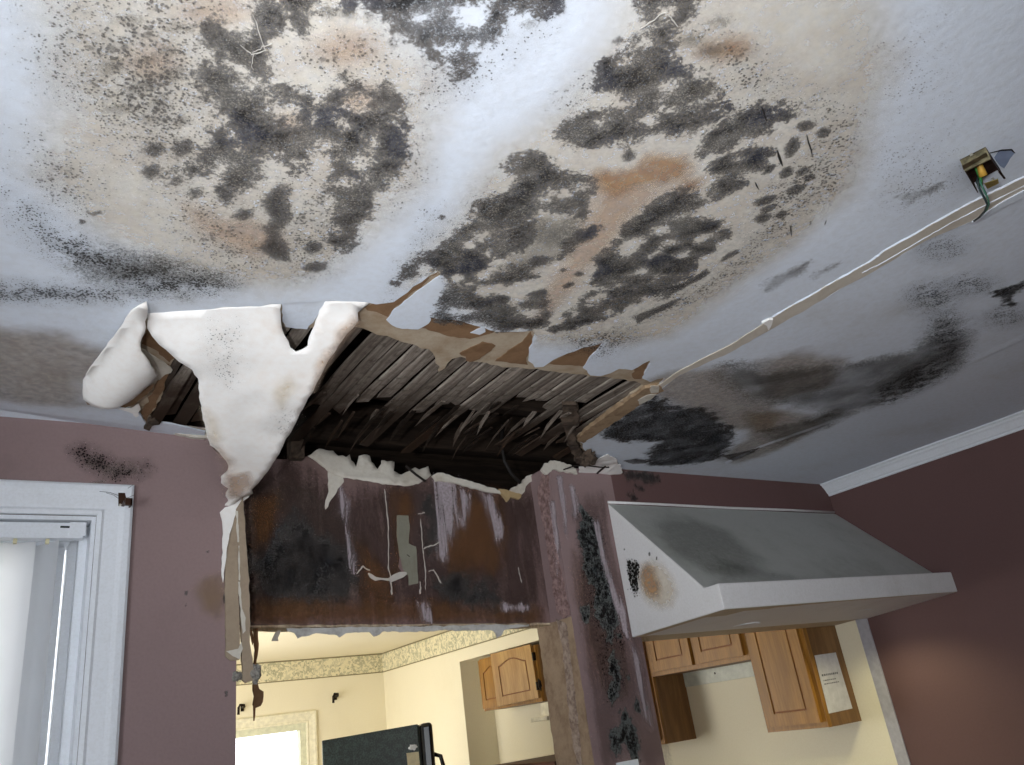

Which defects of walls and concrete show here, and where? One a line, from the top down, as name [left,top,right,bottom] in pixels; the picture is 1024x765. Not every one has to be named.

water stain [0,0,970,358]
peeling [386,274,444,329]
water stain [722,274,1024,441]
mould [68,443,153,482]
spalling [276,443,287,459]
spalling [577,382,664,443]
mould [601,396,759,501]
spalling [224,497,261,685]
water stain [248,486,359,604]
efflorescence [420,474,471,562]
efflorescence [484,494,504,543]
water stain [550,476,651,762]